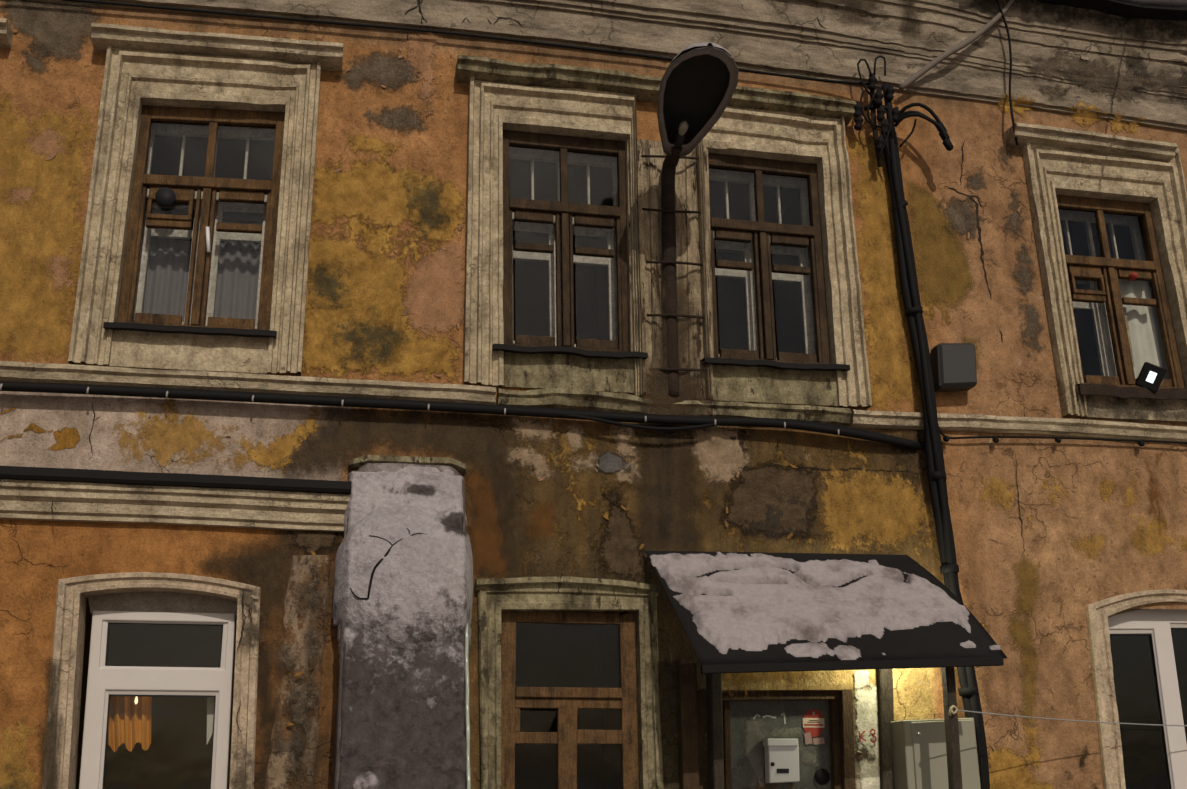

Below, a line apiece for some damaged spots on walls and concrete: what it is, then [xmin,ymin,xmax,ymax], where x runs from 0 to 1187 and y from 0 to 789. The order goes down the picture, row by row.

crack [405,0,427,45]
water stain [970,0,1187,93]
crack [946,140,991,294]
peeling [1,423,80,451]
peeling [98,398,320,472]
water stain [0,662,60,789]